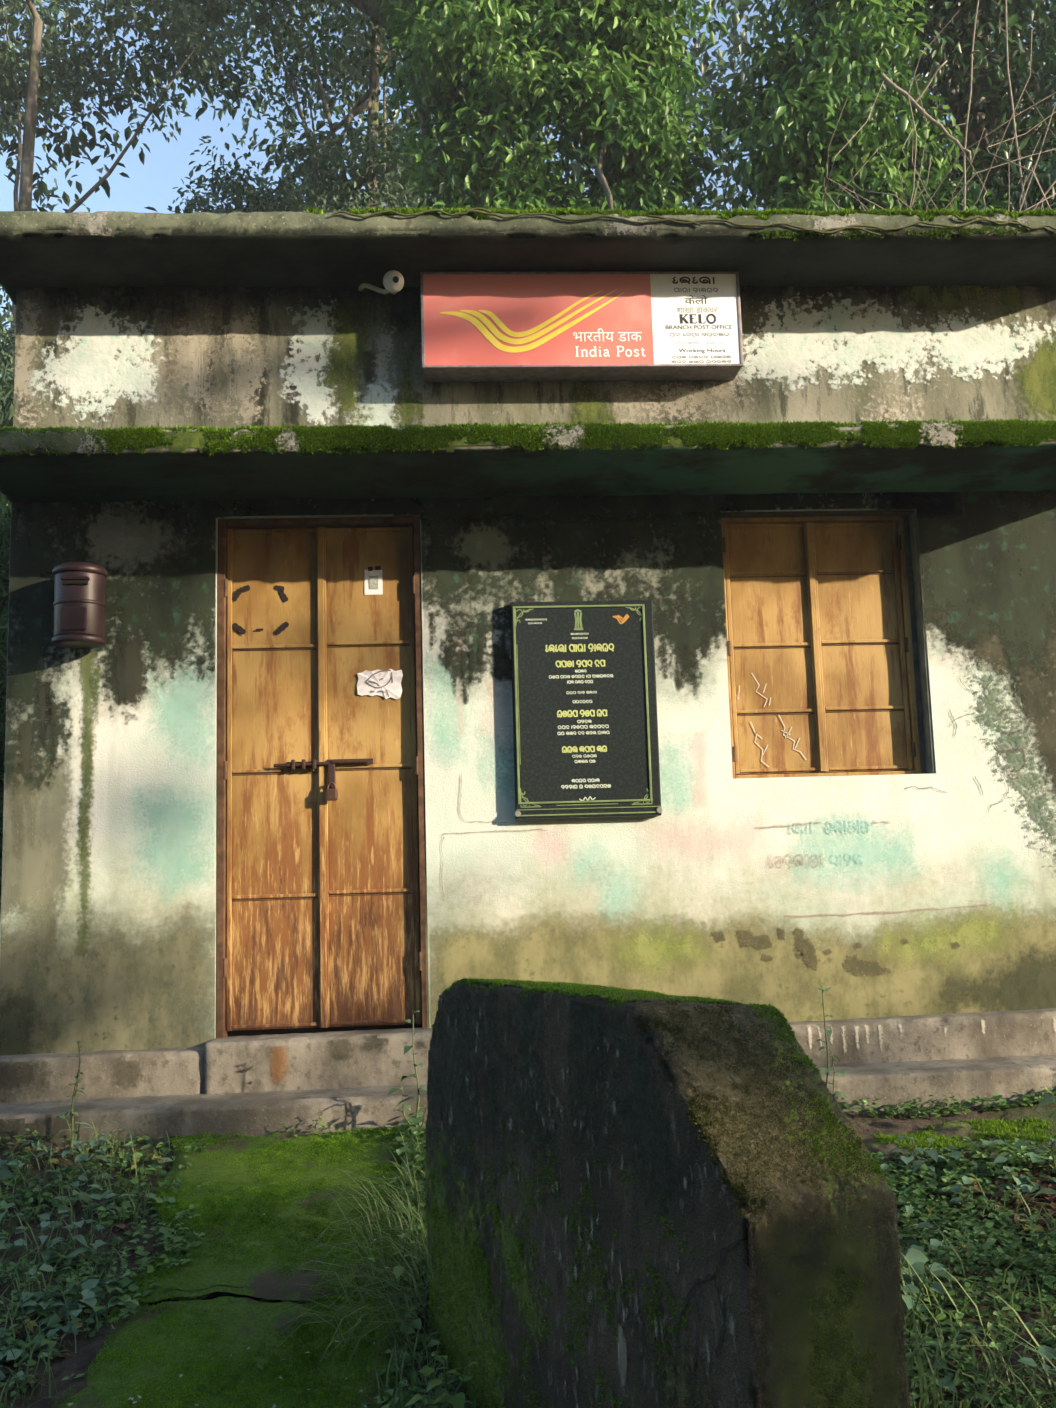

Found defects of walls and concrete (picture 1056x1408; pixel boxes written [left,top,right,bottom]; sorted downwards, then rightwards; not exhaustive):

damp [45,340,58,385]
damp [248,365,268,427]
damp [286,339,299,426]
damp [363,351,378,389]
damp [0,491,1056,1102]
damp [417,903,1056,1168]
damp [0,1117,75,1148]